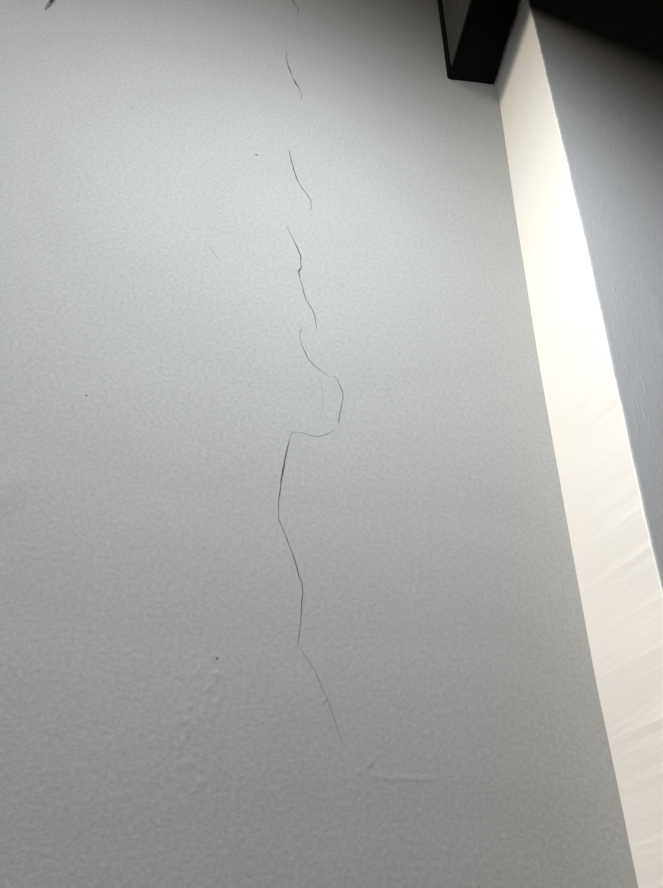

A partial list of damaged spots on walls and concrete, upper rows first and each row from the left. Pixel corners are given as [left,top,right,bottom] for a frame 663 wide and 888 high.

crack [278,226,344,742]